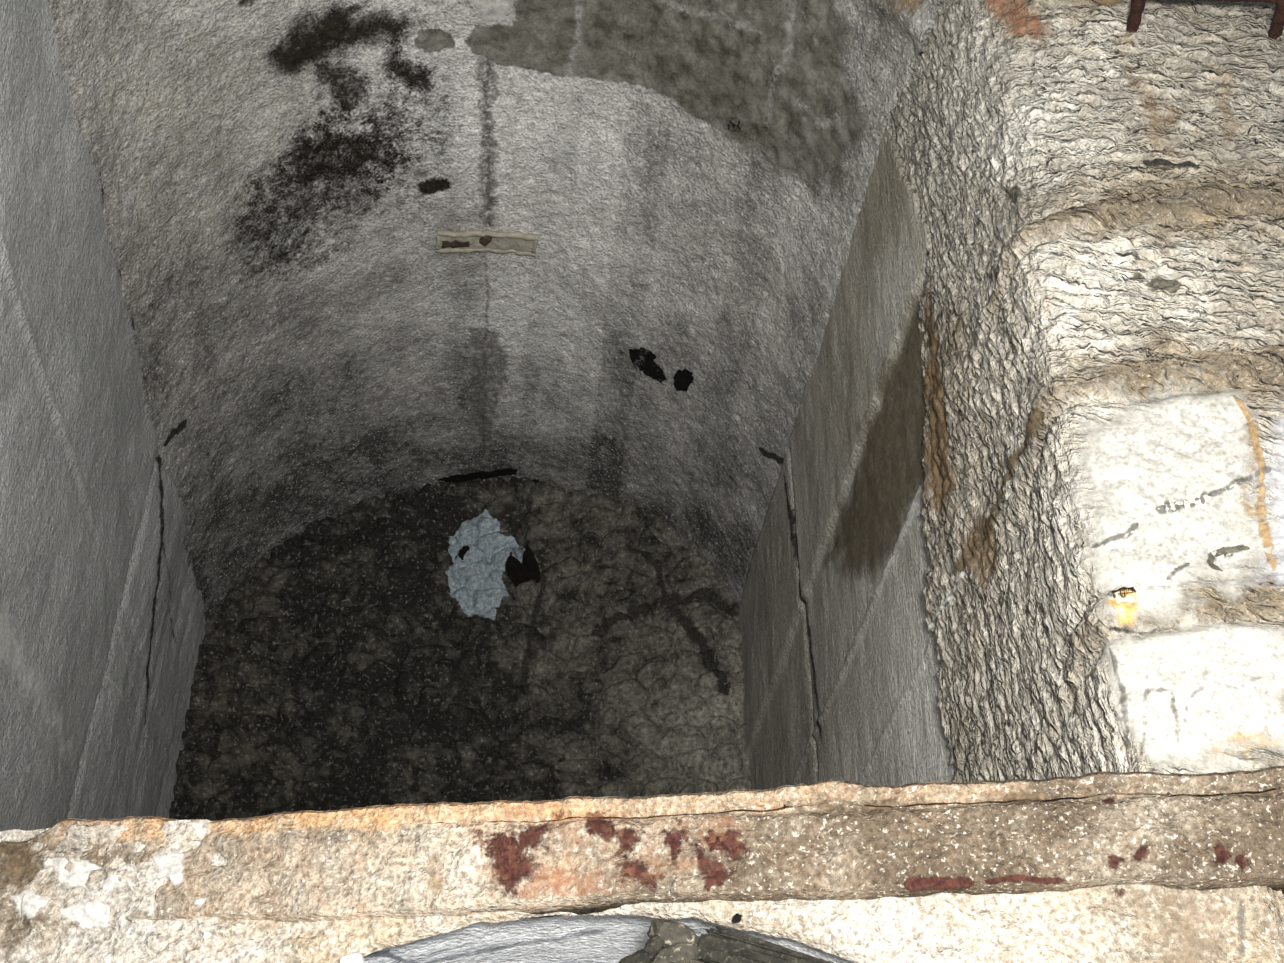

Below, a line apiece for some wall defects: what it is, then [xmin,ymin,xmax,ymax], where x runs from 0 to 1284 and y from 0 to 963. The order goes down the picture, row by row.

leakage [237,0,865,275]
crack [145,420,187,724]
flaking render [445,509,541,620]
crack [758,447,822,742]
leakage [824,293,932,581]
rust [474,811,573,898]
rust [584,811,750,891]